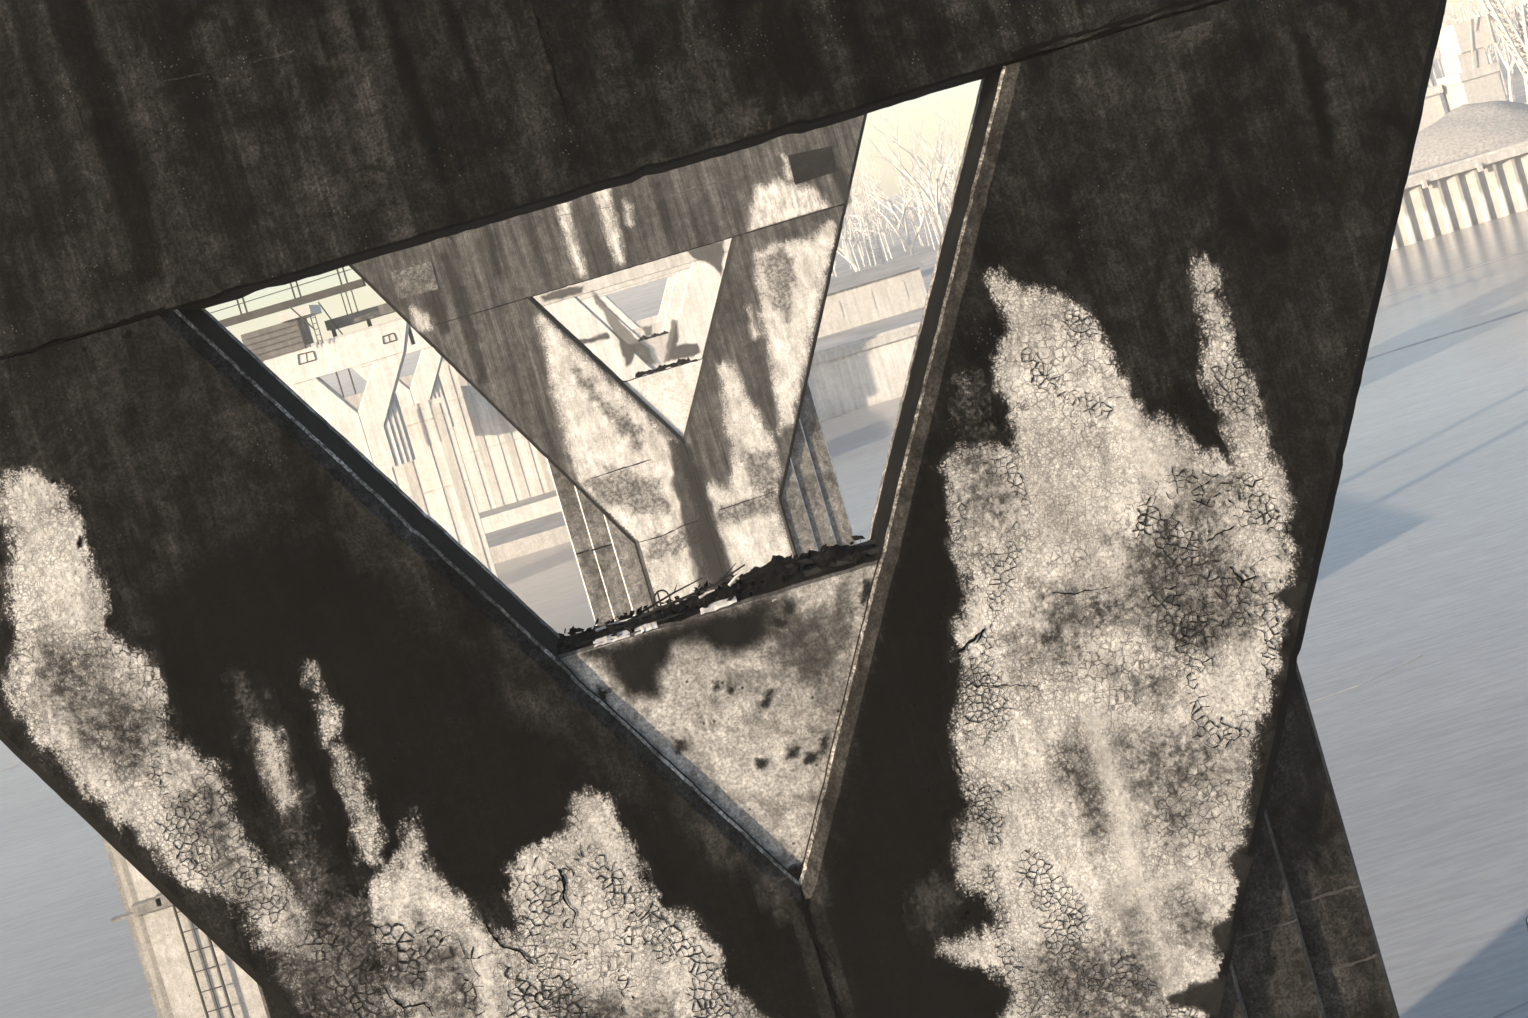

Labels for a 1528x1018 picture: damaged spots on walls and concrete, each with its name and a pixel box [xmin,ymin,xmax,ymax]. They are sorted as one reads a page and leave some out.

damp [1144,347,1223,456]
crack [1207,525,1265,613]
crack [957,628,1036,688]
damp [145,535,830,1018]
crack [552,869,576,927]
crack [383,985,434,1017]
crack [483,921,544,968]
crack [795,898,844,1018]